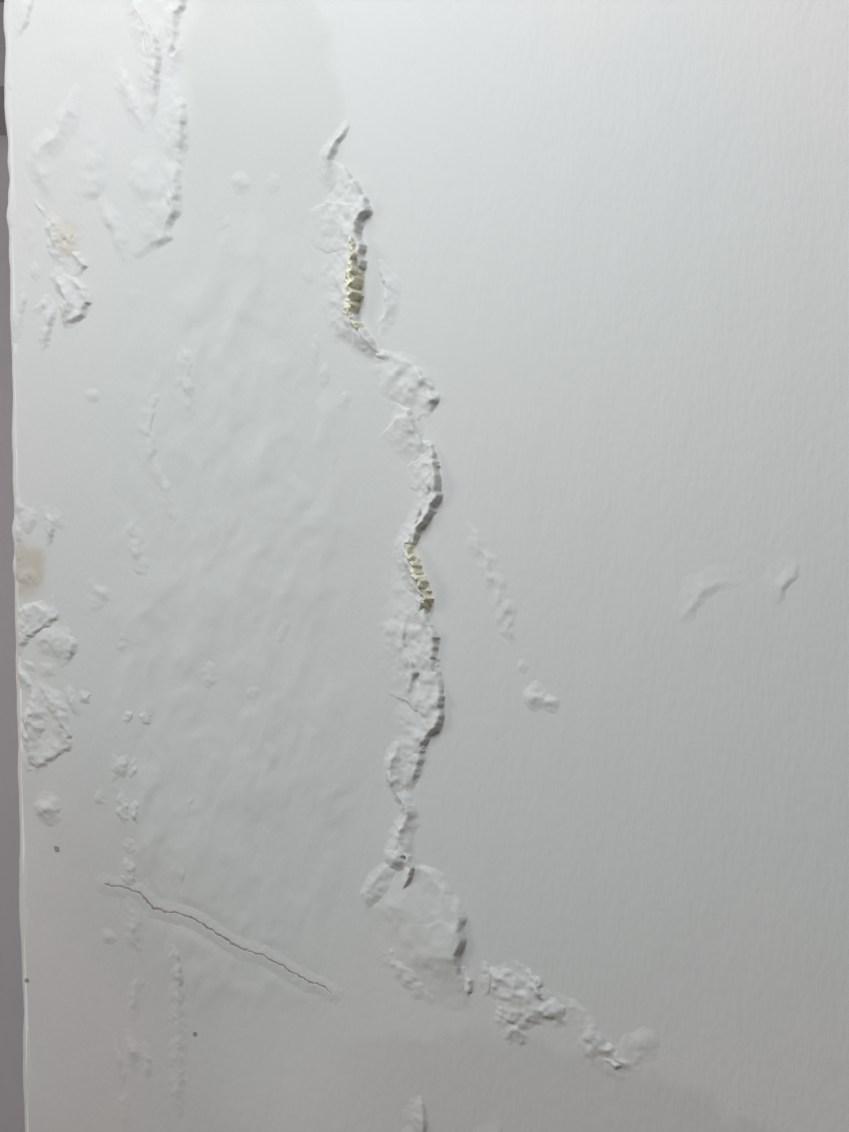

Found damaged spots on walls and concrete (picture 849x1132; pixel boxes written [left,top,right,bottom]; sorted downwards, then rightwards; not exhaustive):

peeling [9,198,92,352]
peeling [14,496,92,776]